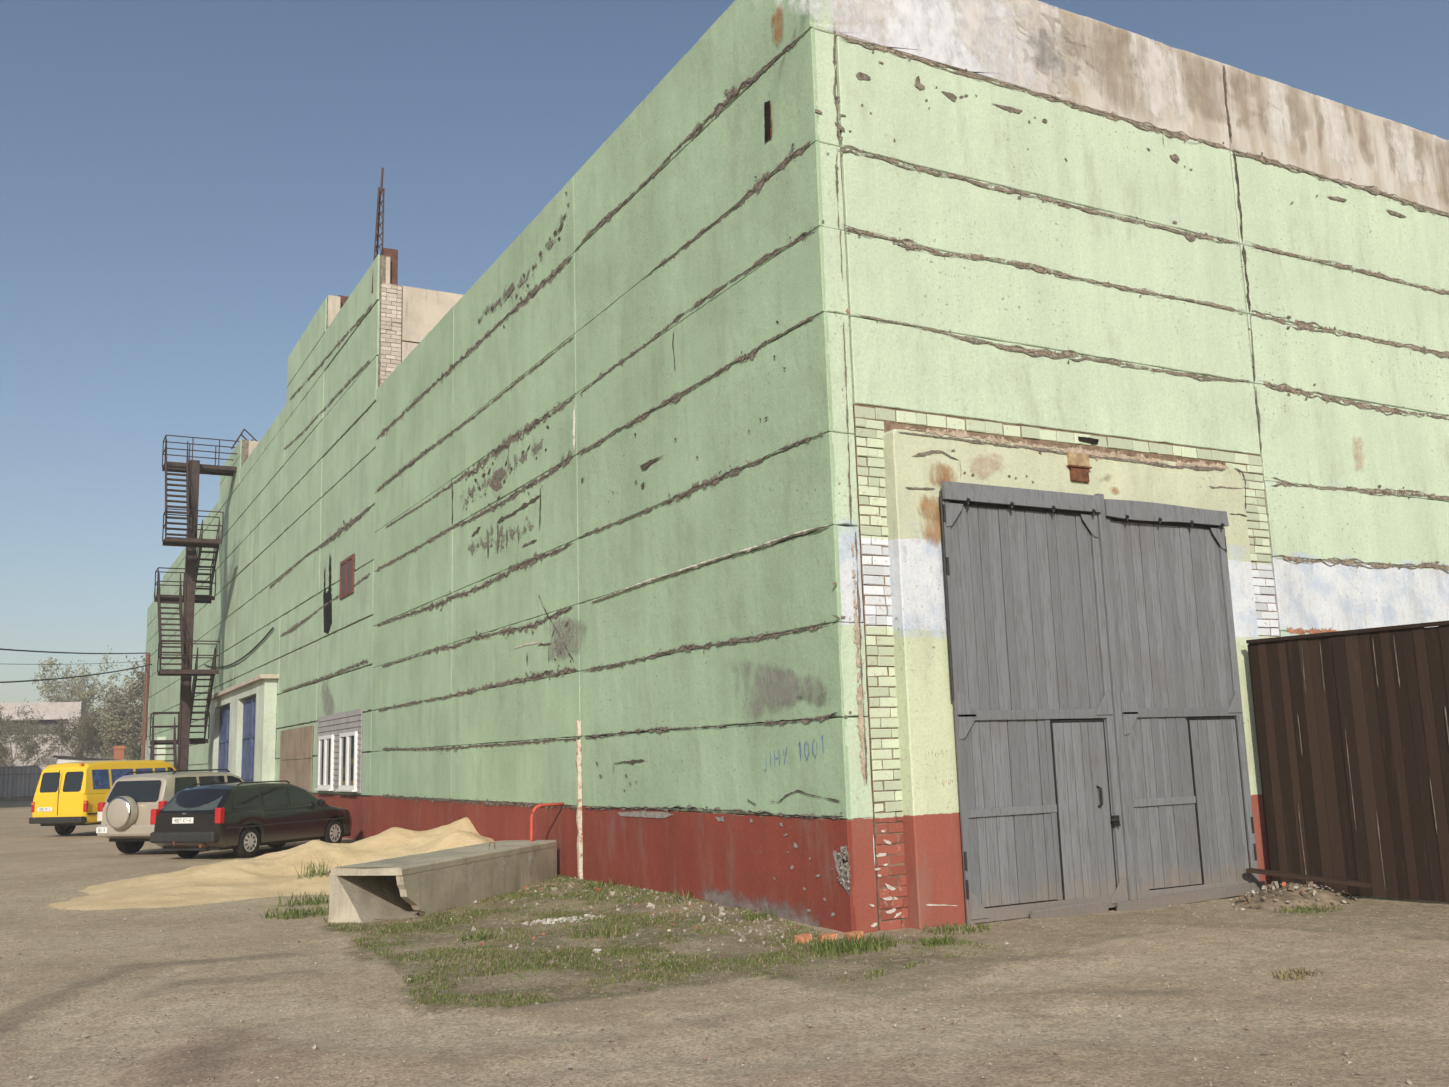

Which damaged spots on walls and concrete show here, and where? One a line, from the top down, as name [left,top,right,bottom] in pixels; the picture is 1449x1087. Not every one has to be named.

leakage [802,0,1085,98]
peeling [992,103,1047,123]
leakage [1130,33,1185,117]
leakage [1269,82,1291,142]
leakage [1391,125,1420,182]
crack [1209,65,1262,517]
peeling [463,425,549,515]
rust [922,465,950,542]